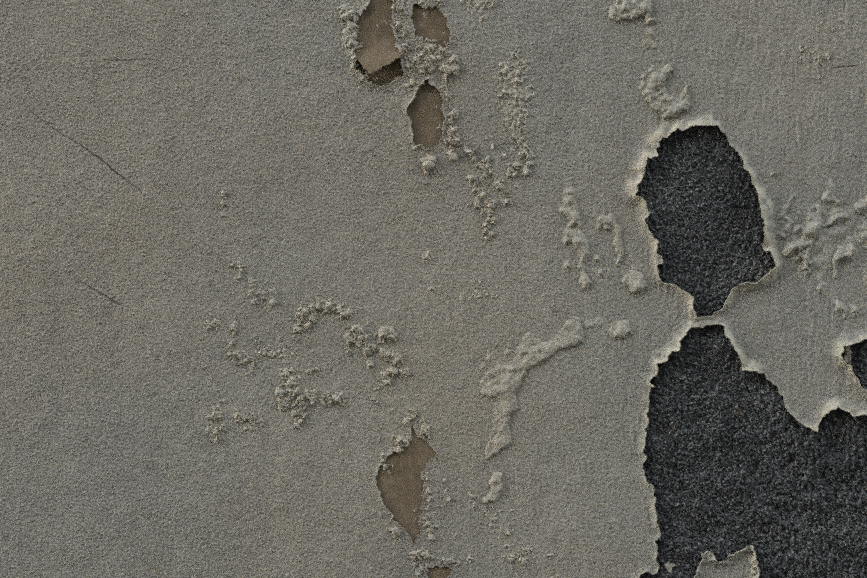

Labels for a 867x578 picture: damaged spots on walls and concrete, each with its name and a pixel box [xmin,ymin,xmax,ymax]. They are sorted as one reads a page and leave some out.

peeling [336,0,477,185]
spalling [636,125,867,578]
peeling [372,408,471,578]